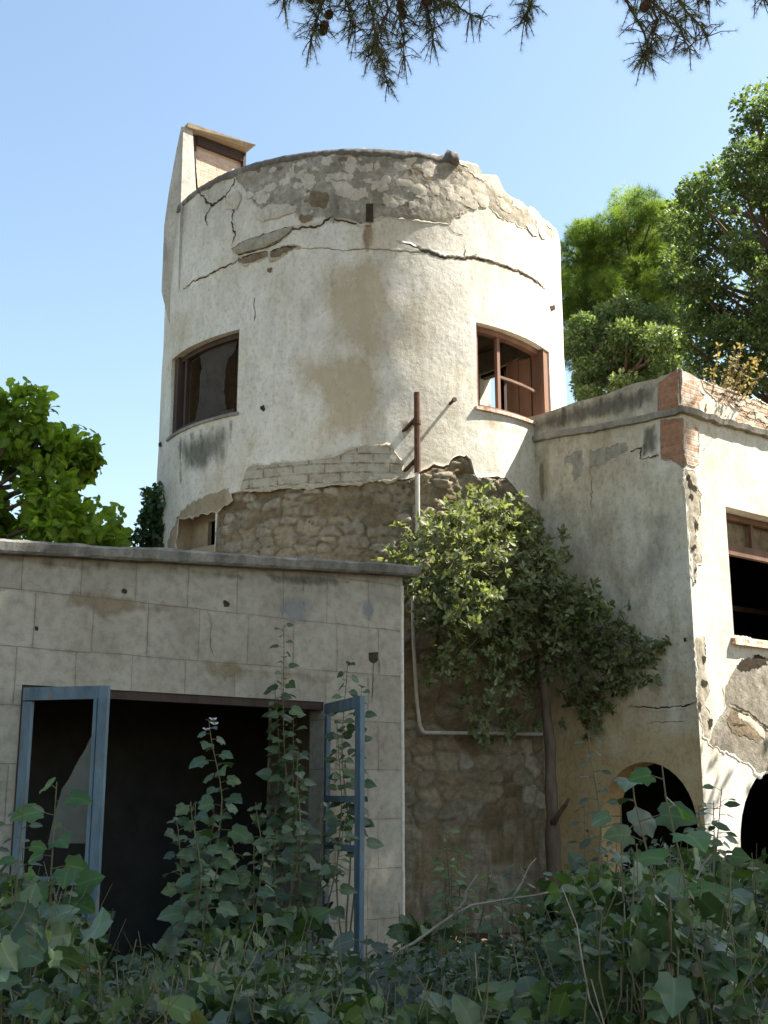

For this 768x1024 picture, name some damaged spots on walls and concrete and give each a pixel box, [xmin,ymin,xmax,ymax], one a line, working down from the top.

crack [183,178,240,289]
flaking render [225,148,557,240]
crack [292,207,547,289]
water stain [546,389,648,426]
water stain [180,433,223,466]
flaking render [167,442,405,549]
flaking render [563,441,631,484]
crack [628,701,699,724]
flaking render [683,635,768,779]